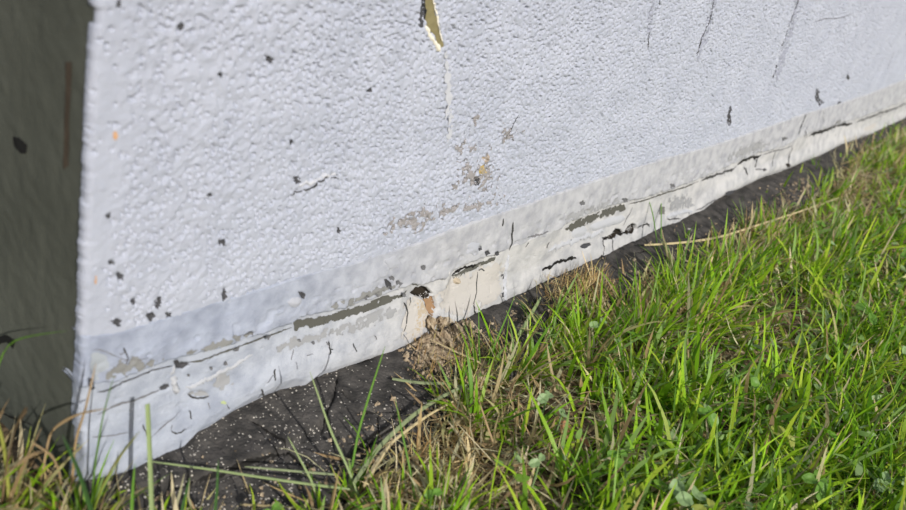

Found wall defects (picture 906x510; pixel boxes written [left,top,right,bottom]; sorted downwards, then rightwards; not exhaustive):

spalling [418,0,444,52]
crack [292,177,339,195]
crack [603,103,906,255]
crack [502,219,577,271]
crack [403,297,411,343]
spalling [410,286,436,340]
crack [452,265,504,321]